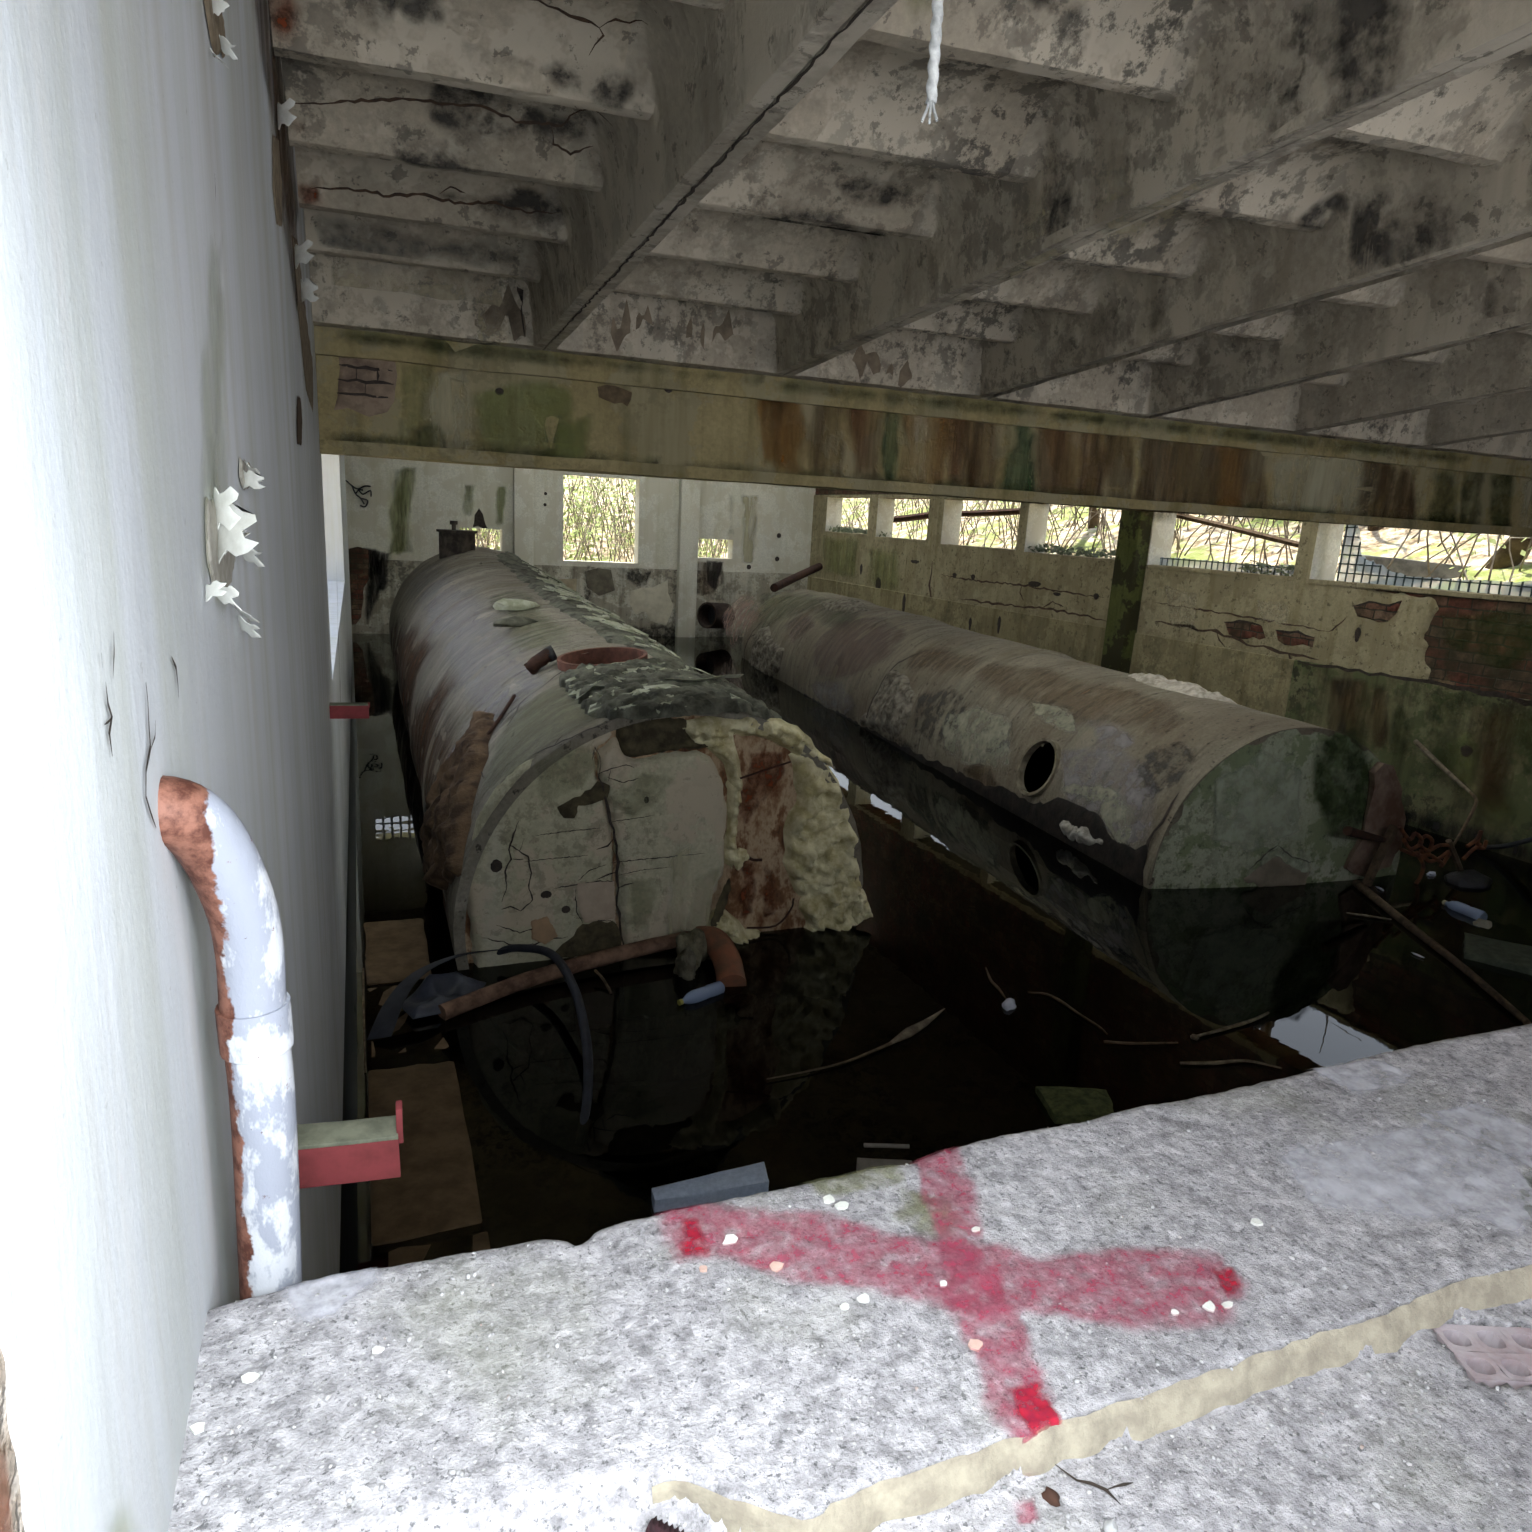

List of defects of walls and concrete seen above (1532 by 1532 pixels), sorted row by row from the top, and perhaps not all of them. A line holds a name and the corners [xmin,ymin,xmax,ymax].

peeling [204,0,238,67]
damp [1333,0,1404,105]
crack [295,97,609,156]
crack [312,186,557,214]
crack [517,0,873,340]
damp [1302,193,1439,267]
peeling [205,457,265,638]
damp [697,561,723,595]
flaking render [1224,620,1315,647]
damp [909,650,1194,844]
flaking render [0,1232,46,1532]
crack [1055,1464,1133,1505]